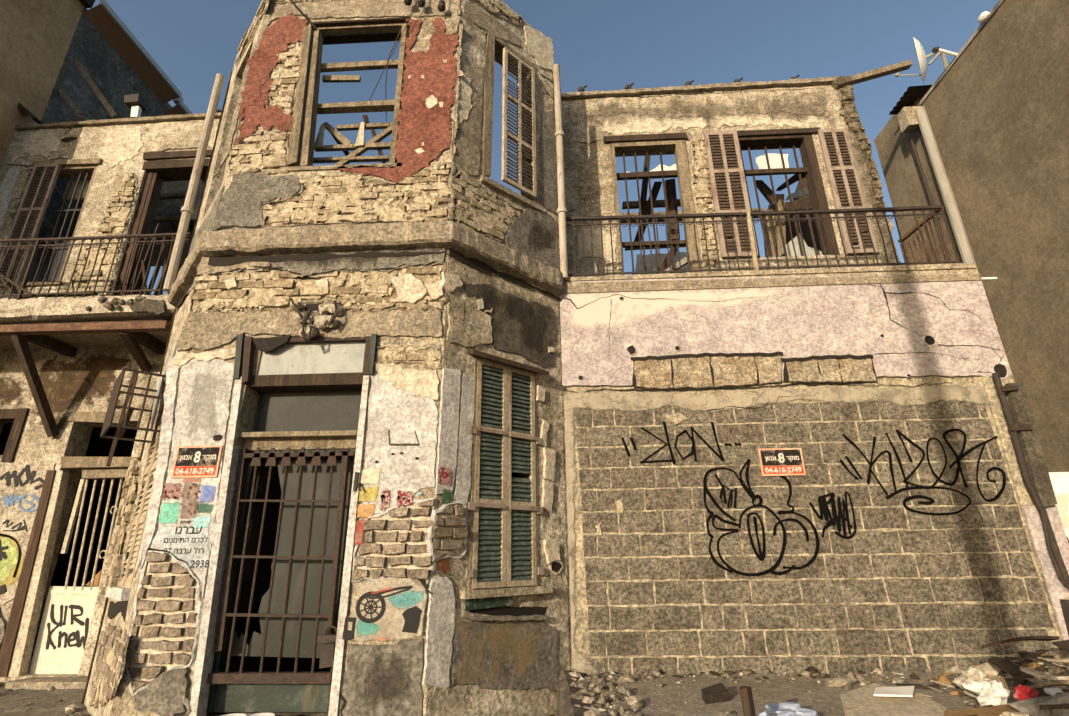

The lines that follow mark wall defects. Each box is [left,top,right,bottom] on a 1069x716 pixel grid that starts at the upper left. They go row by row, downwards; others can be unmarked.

flaking render [235,0,351,67]
peeling [446,11,460,35]
flaking render [473,0,524,27]
flaking render [269,42,302,115]
peeling [426,95,444,109]
flaking render [228,130,524,243]
flaking render [187,262,493,370]
crack [564,275,1009,411]
water stain [0,365,24,405]
water stain [39,353,133,429]
flaking render [351,498,468,592]
flaking render [90,550,204,709]